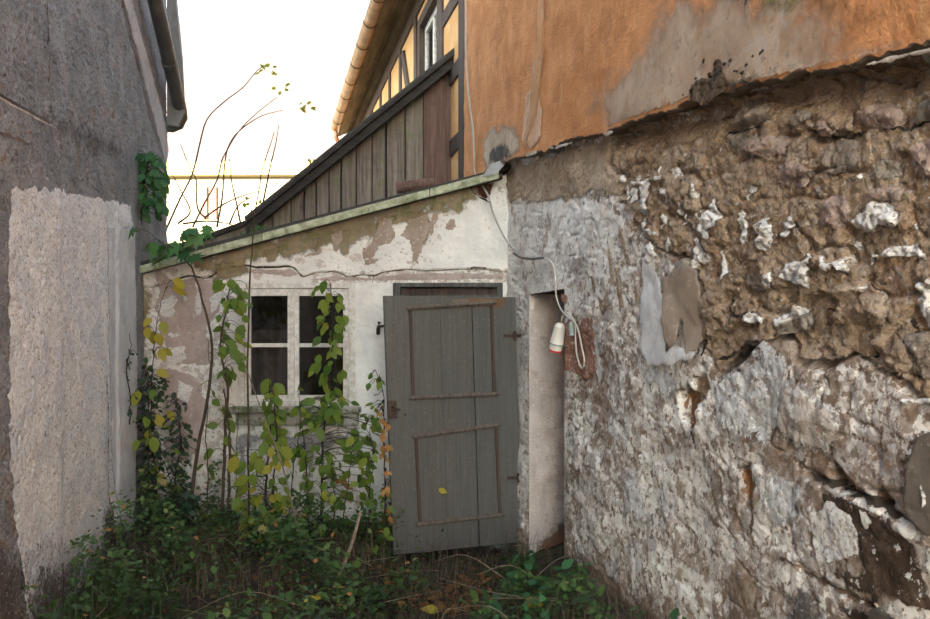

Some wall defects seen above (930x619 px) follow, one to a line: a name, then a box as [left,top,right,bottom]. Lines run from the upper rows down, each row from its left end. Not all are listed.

crack [0,0,62,163]
water stain [604,0,827,125]
peeling [362,212,456,265]
spalling [506,47,930,405]